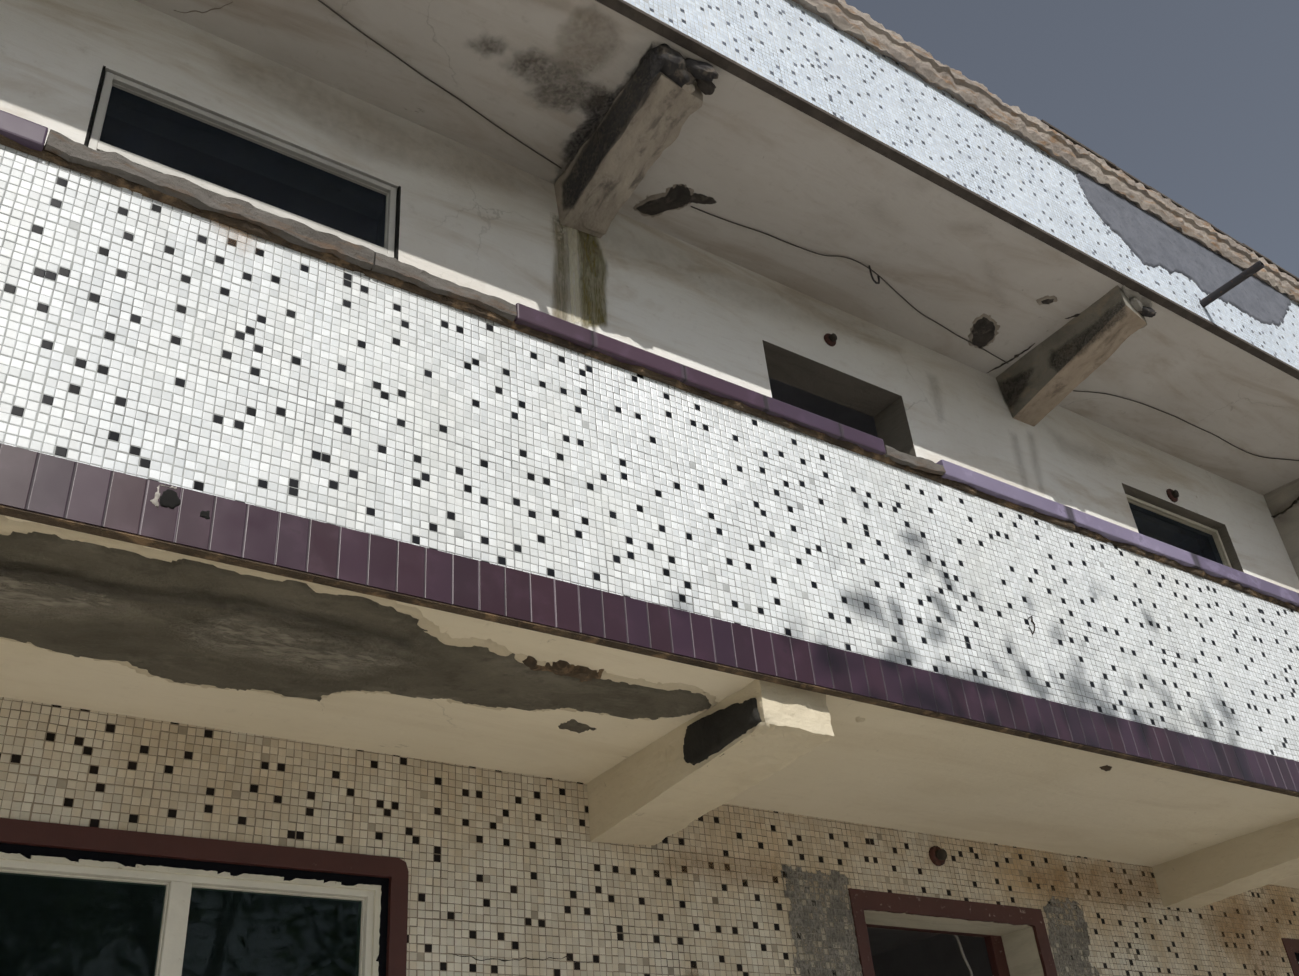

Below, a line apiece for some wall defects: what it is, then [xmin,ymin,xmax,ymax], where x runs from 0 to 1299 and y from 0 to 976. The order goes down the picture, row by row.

spalling [639,43,719,95]
water stain [516,45,664,209]
spalling [633,184,716,217]
water stain [568,227,606,327]
spalling [1122,285,1157,329]
spalling [968,313,1000,349]
spalling [150,485,180,509]
crack [1271,497,1299,518]
peeling [0,515,718,717]
spalling [532,708,609,733]
spalling [751,722,770,737]